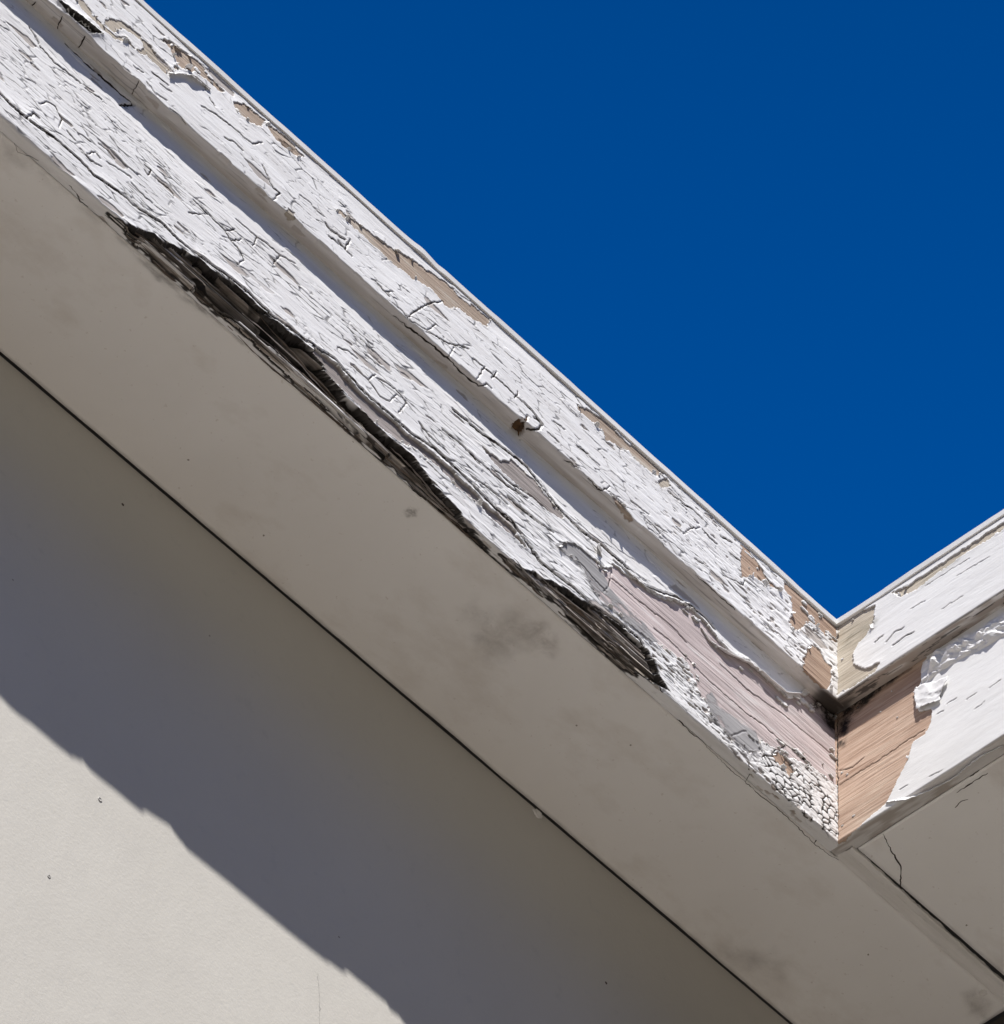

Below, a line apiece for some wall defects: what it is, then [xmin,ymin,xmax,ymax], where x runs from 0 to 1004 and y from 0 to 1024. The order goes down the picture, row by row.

peeling [67,0,224,92]
crack [29,2,262,145]
peeling [233,102,303,158]
peeling [336,209,491,327]
peeling [313,352,521,544]
crack [0,94,921,858]
peeling [485,451,562,518]
peeling [610,492,632,522]
peeling [577,405,669,488]
peeling [895,524,1004,597]
peeling [585,544,1003,844]
crack [884,836,902,889]